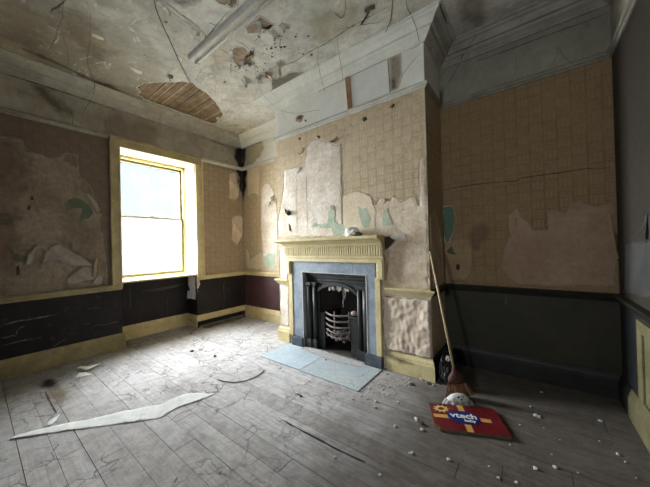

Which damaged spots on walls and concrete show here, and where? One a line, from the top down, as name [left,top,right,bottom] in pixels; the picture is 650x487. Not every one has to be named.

crack [1,0,115,129]
spalling [136,75,224,125]
peeling [229,15,290,100]
crack [198,5,391,117]
peeling [0,136,107,297]
peeling [229,173,239,200]
peeling [232,216,242,245]
peeling [246,139,344,326]
peeling [349,157,472,289]
peeling [502,202,615,286]